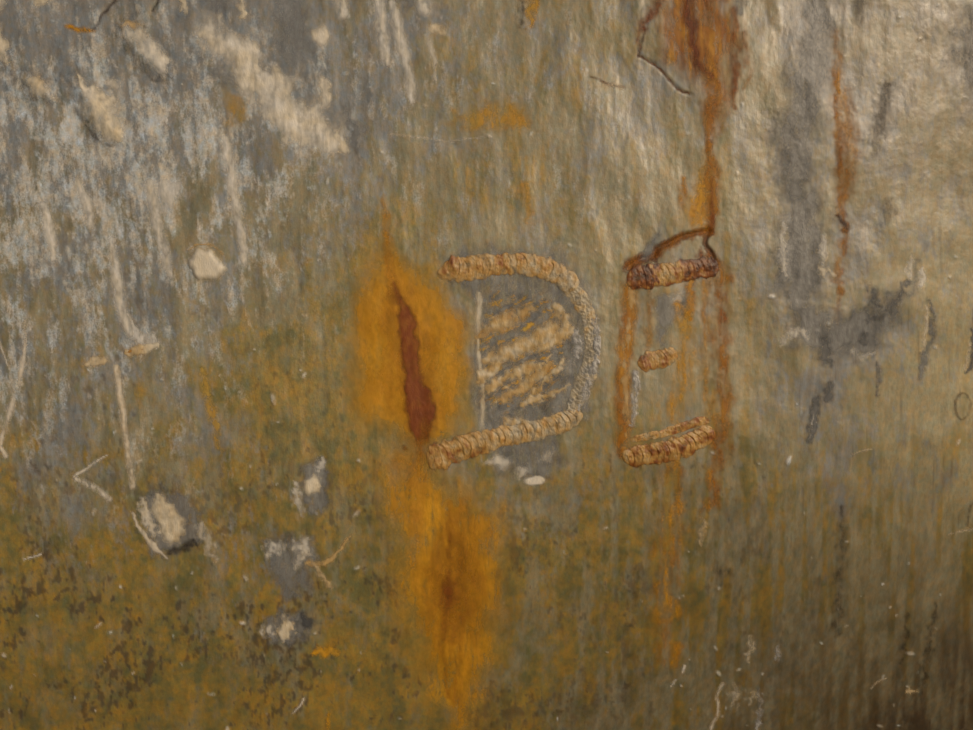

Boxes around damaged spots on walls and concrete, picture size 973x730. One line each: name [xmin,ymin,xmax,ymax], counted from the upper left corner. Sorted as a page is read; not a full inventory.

corrosion [639,0,746,235]
corrosion [832,72,850,293]
corrosion [615,284,636,456]
corrosion [711,260,733,373]
peeling [132,492,216,559]
peeling [260,535,350,645]
peeling [293,458,329,514]
corrosion [354,230,504,728]